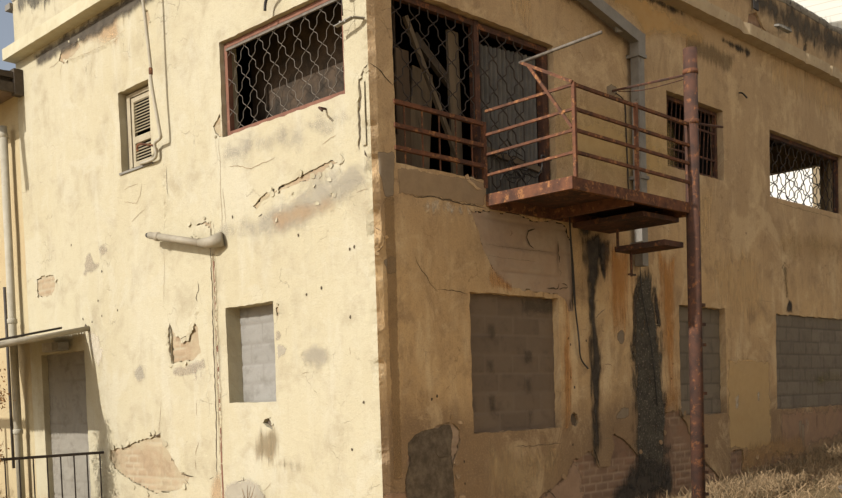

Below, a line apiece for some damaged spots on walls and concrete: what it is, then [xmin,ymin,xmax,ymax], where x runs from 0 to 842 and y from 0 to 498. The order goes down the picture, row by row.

mould [18,0,48,11]
mould [36,0,148,64]
damp [759,0,842,55]
crack [489,229,573,309]
flaking render [169,325,201,368]
damp [580,229,610,462]
damp [616,269,672,498]
flaking render [404,415,466,498]
flaking render [539,427,643,498]
flaking render [652,405,691,498]